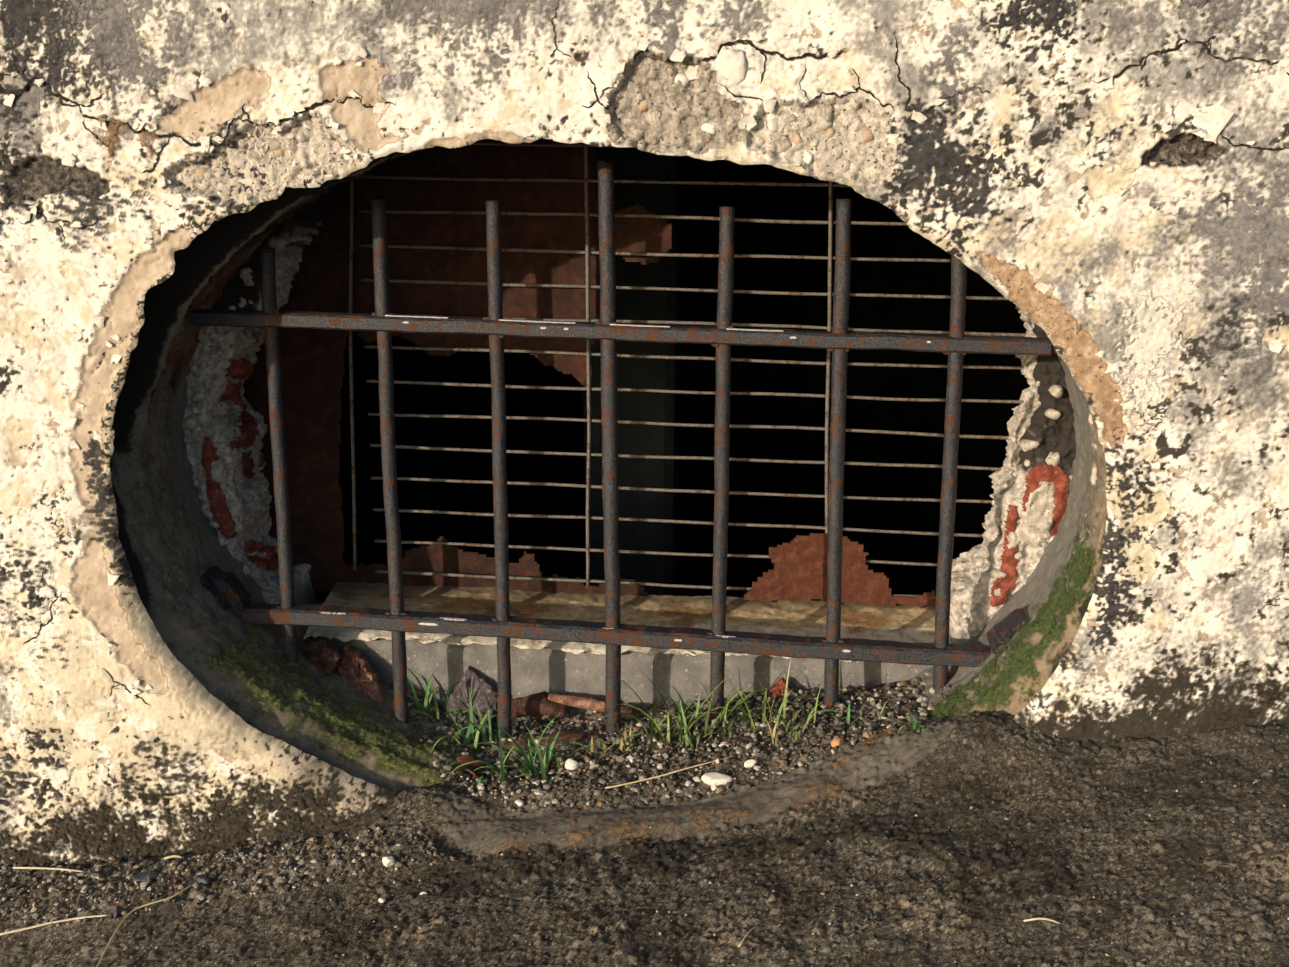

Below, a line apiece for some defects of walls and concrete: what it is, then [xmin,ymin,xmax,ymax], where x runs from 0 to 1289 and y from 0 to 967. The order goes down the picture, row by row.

crack [0,70,396,173]
spalling [132,47,405,211]
spalling [594,46,901,187]
crack [545,0,990,130]
spalling [1076,104,1234,202]
crack [1094,36,1289,89]
crack [1221,133,1289,151]
peeling [977,252,1136,449]
flaking render [989,463,1069,607]
corrosion [438,597,545,616]
leakage [1210,664,1289,729]
leakage [0,724,397,867]